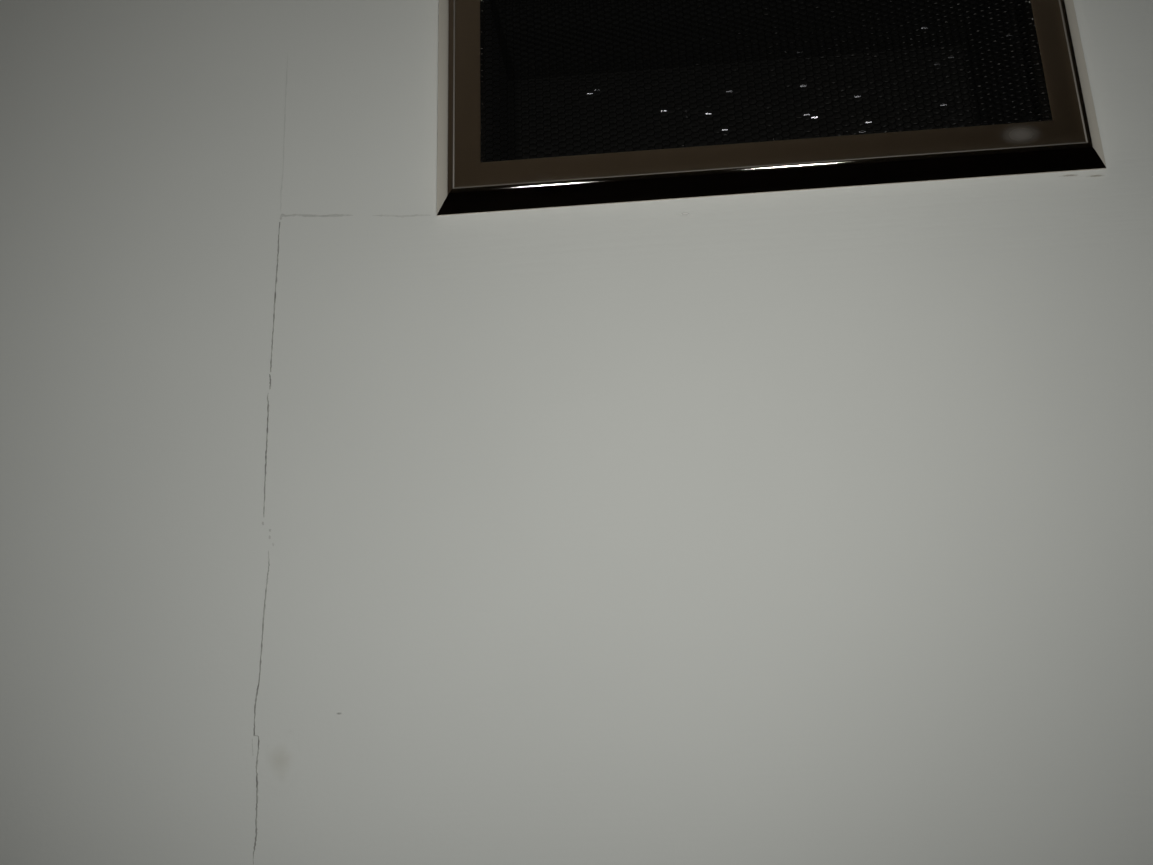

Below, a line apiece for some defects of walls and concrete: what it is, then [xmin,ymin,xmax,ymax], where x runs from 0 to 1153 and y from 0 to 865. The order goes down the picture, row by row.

crack [252,214,430,864]